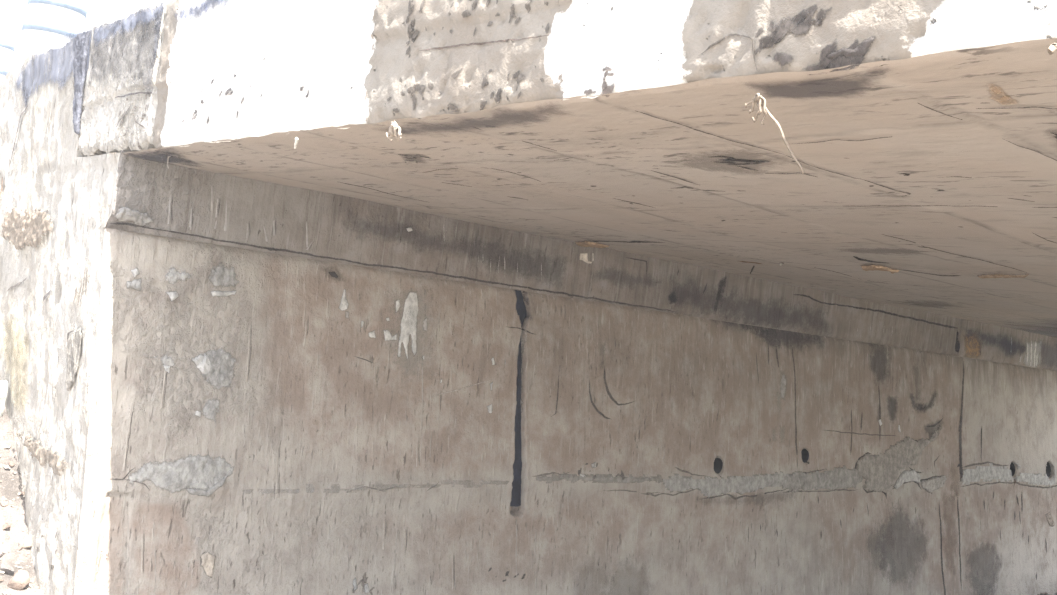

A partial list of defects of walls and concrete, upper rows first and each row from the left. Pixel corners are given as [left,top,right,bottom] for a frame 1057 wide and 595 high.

damp [396,111,545,134]
crack [637,111,942,206]
damp [761,79,865,98]
spalling [1,207,53,250]
crack [509,290,569,507]
crack [855,332,982,595]